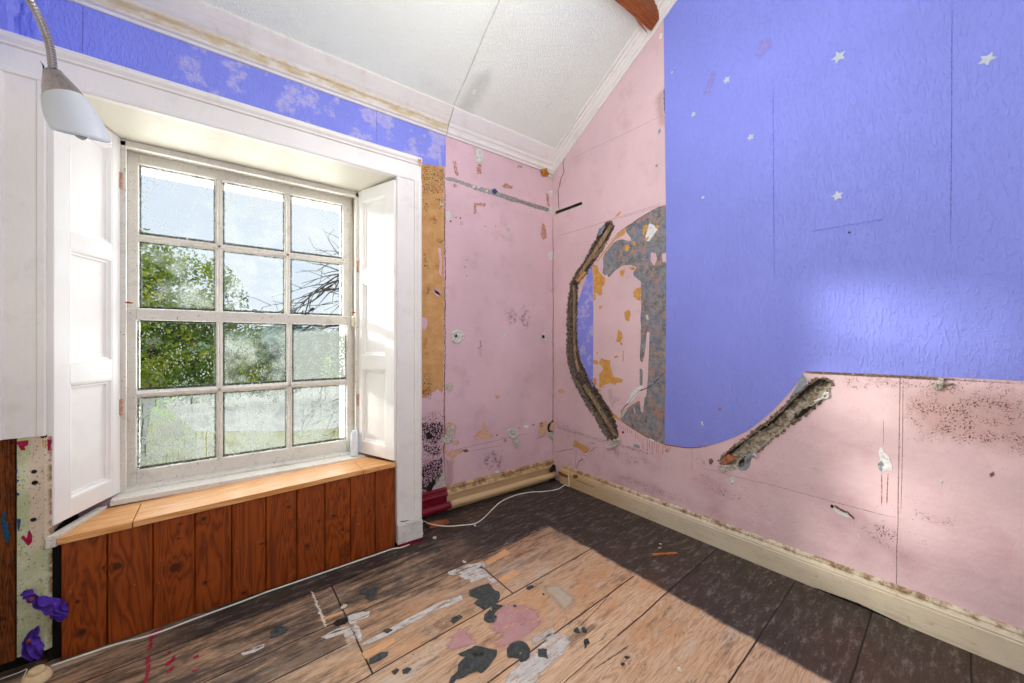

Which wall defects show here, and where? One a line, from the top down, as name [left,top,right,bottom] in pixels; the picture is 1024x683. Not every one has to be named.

peeling [421,164,454,398]
peeling [603,205,666,444]
leakage [422,412,446,492]
spalling [440,422,468,463]
spalling [512,420,555,449]
leakage [911,394,1024,444]
peeling [17,519,32,546]